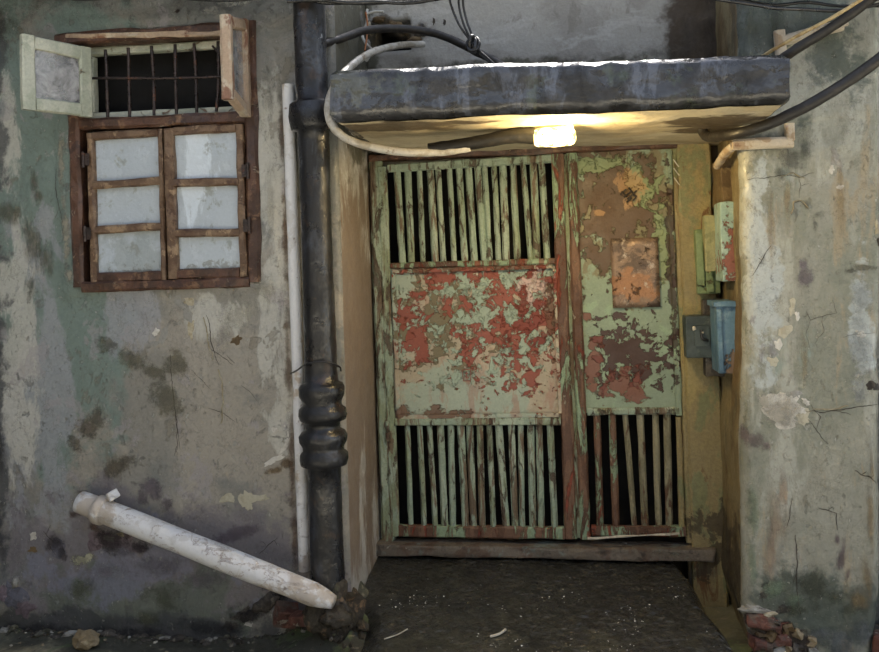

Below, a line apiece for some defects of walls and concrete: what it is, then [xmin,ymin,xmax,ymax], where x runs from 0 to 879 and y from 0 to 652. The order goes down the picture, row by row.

crack [203,315,233,364]
damp [145,352,187,412]
damp [69,410,103,450]
peeling [759,390,810,429]
crack [806,404,877,442]